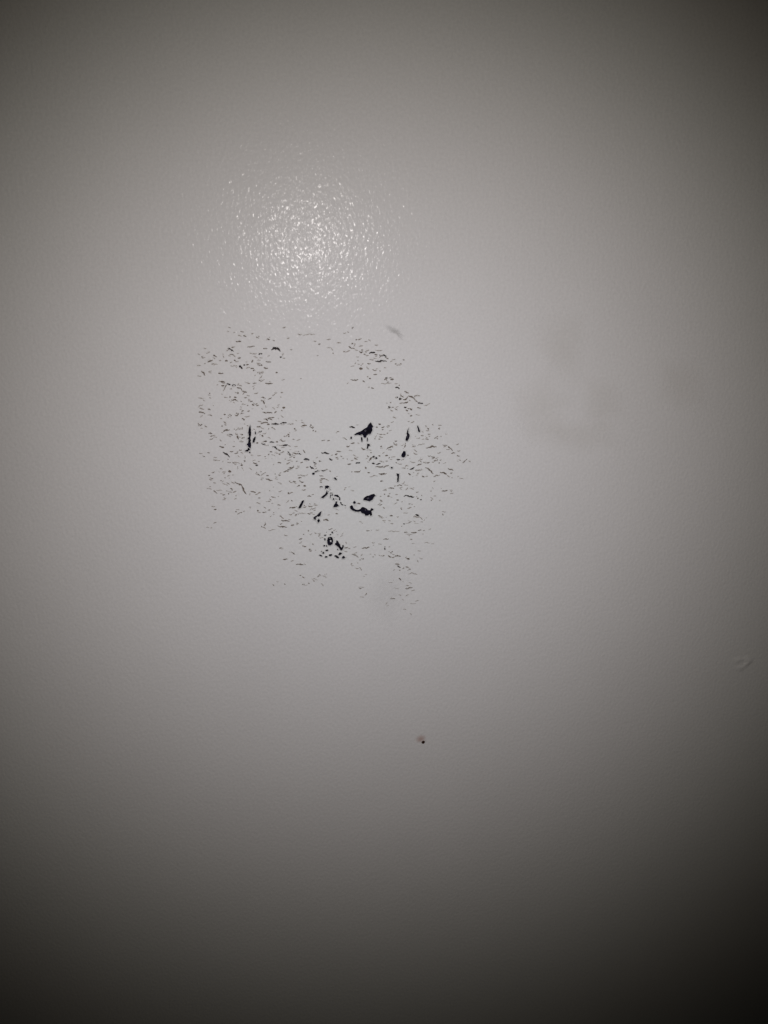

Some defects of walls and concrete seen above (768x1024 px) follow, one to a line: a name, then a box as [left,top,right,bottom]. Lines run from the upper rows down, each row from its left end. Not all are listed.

peeling [349,421,375,451]
peeling [389,426,412,470]
spalling [312,476,377,560]